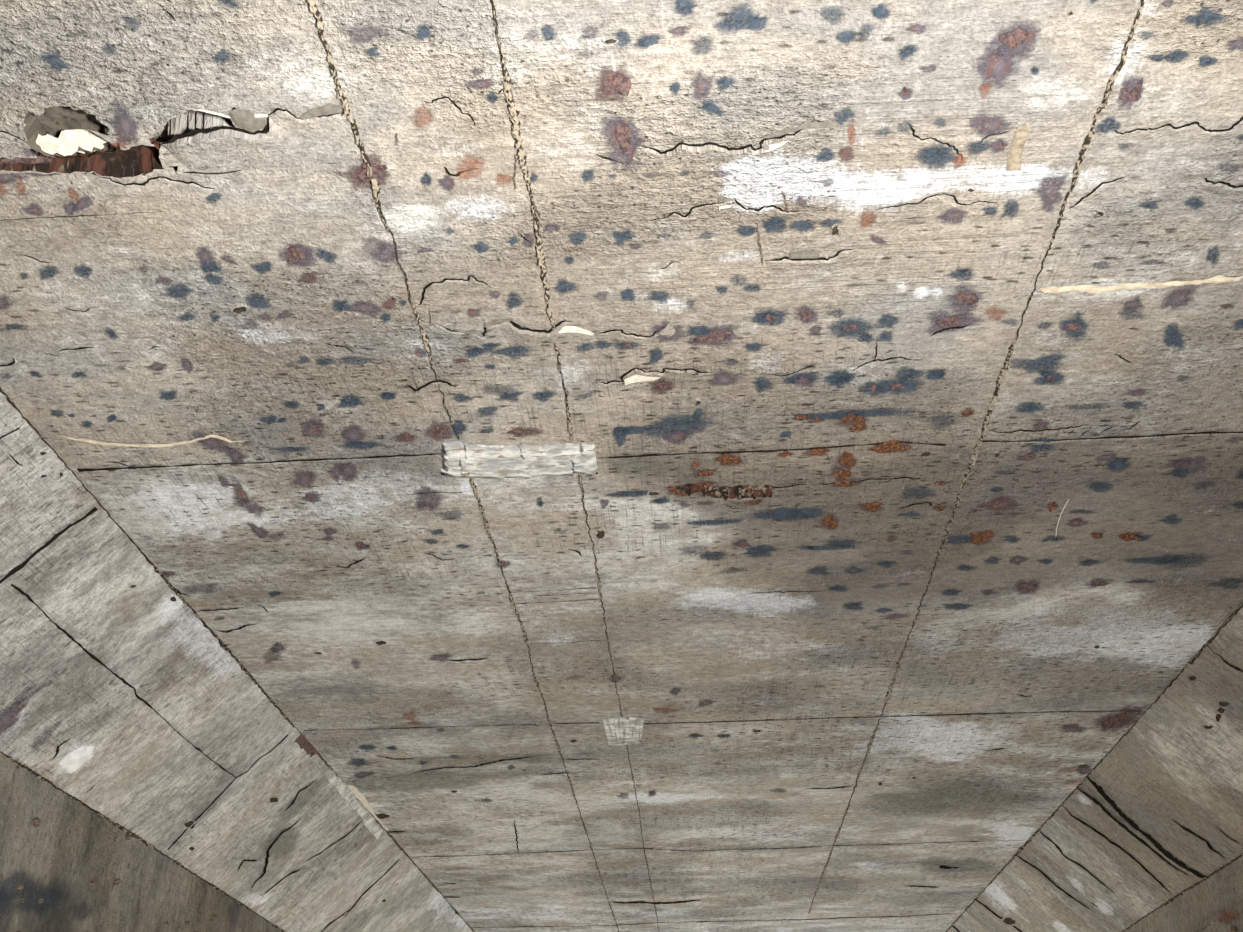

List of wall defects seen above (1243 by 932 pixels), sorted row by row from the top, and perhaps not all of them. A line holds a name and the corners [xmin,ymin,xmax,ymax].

spalling [0,92,268,185]
water stain [817,148,835,161]
water stain [918,145,956,168]
crack [876,122,1009,222]
water stain [969,141,990,154]
crack [594,122,859,279]
crack [419,275,719,397]
corrosion [838,410,867,431]
corrosion [666,454,741,505]
corrosion [779,448,860,487]
corrosion [868,440,912,453]
crack [1015,776,1240,911]